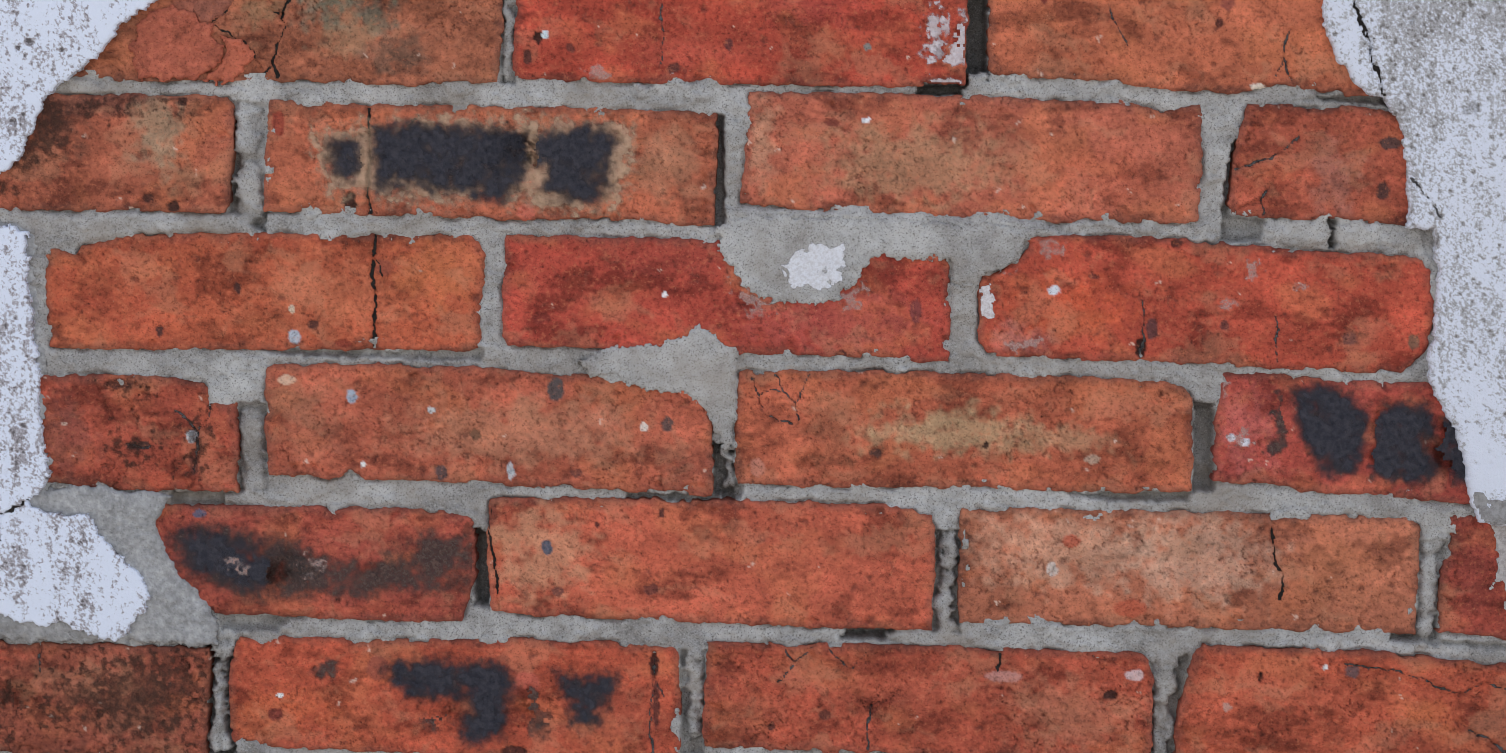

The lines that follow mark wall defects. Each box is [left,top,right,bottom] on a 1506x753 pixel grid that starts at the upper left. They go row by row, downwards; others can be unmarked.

spalling [128,0,255,86]
crack [212,0,291,78]
peeling [919,1,968,84]
spalling [0,219,47,375]
peeling [979,283,996,319]
peeling [1473,492,1506,526]
peeling [0,457,219,648]